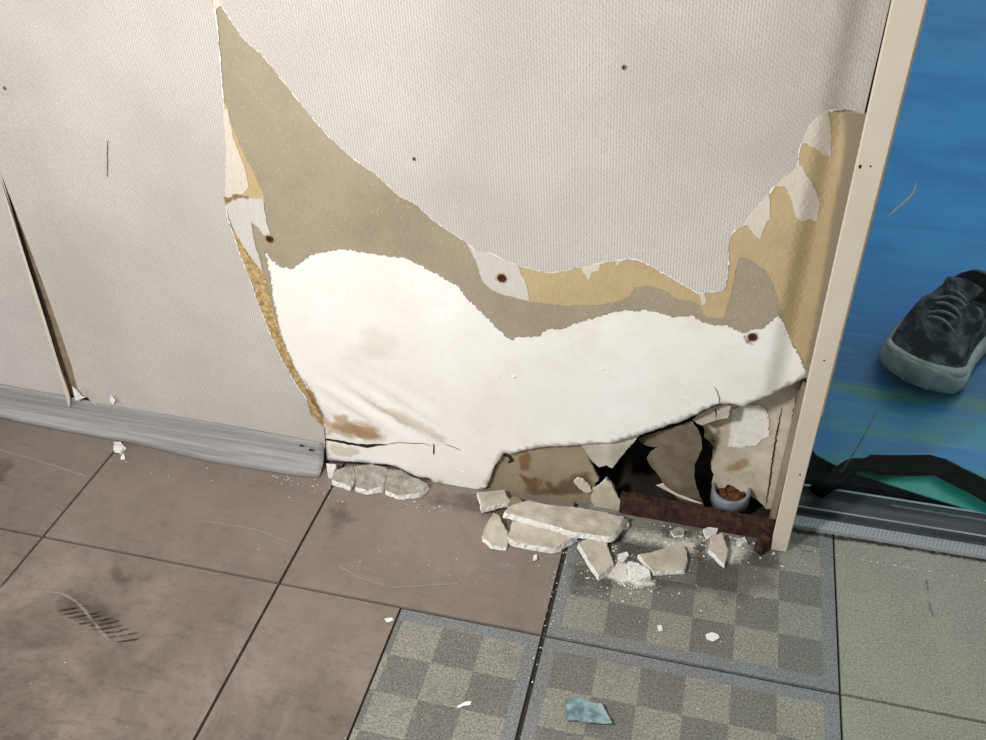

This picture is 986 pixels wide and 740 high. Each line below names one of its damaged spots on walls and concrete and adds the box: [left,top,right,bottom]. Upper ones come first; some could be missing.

crack [325,439,461,480]
spalling [212,0,866,524]